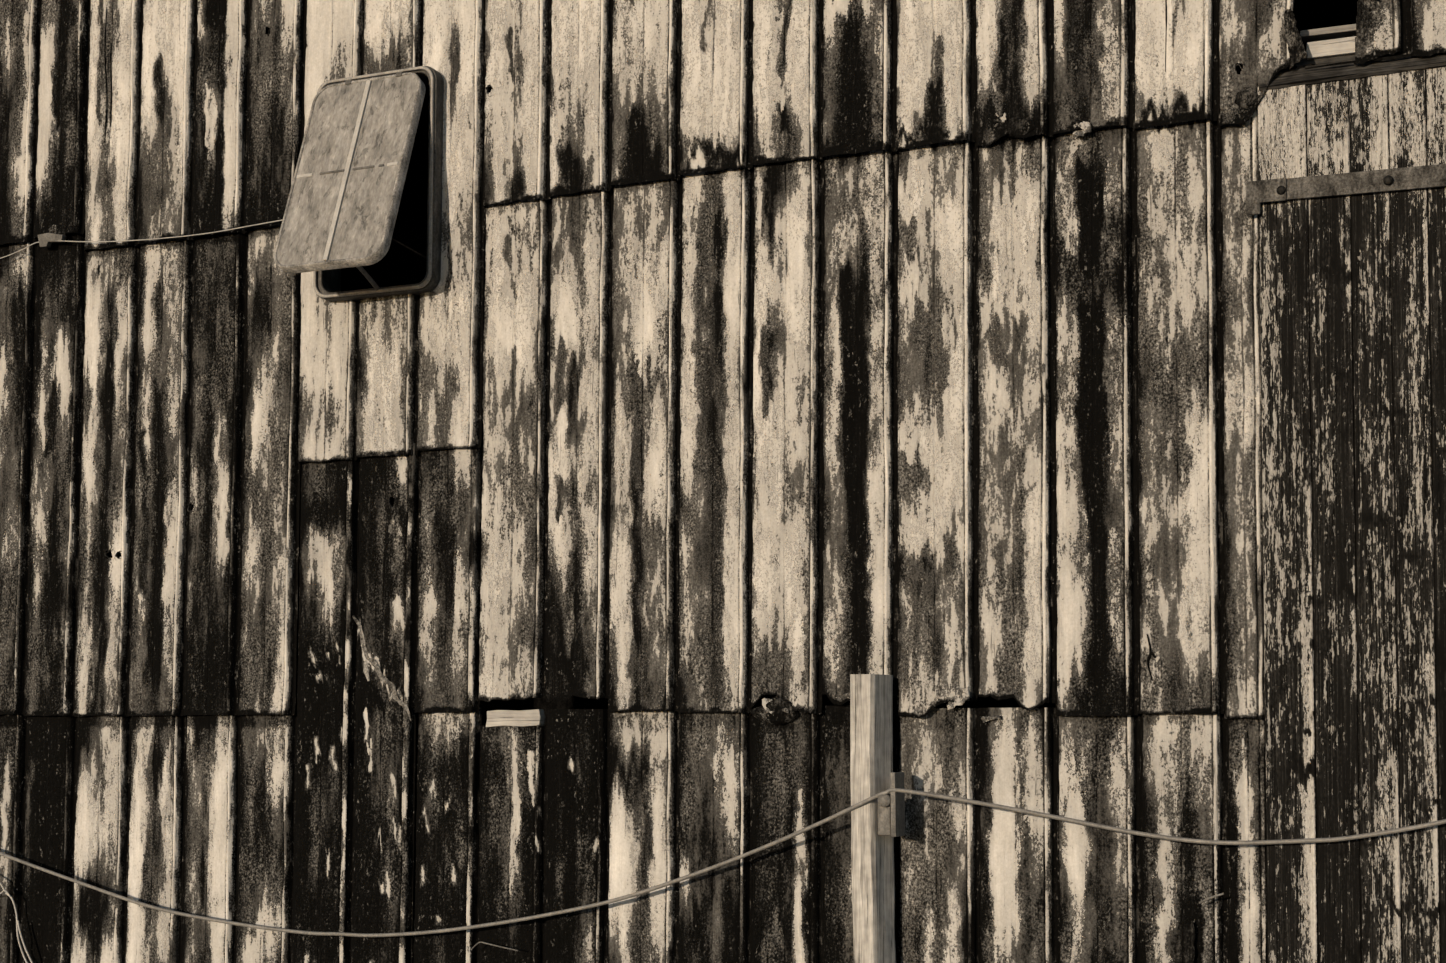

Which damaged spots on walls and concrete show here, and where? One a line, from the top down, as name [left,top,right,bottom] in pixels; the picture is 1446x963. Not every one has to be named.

peeling [1373,6,1393,50]
peeling [1240,80,1350,181]
peeling [1366,67,1446,171]
peeling [1380,192,1389,241]
peeling [1422,188,1430,325]
leakage [0,0,298,963]
leakage [240,0,1291,963]
peeling [1349,604,1357,692]
peeling [1387,664,1397,708]
peeling [1299,649,1317,963]
peeling [1377,761,1401,963]
peeling [1421,653,1440,963]